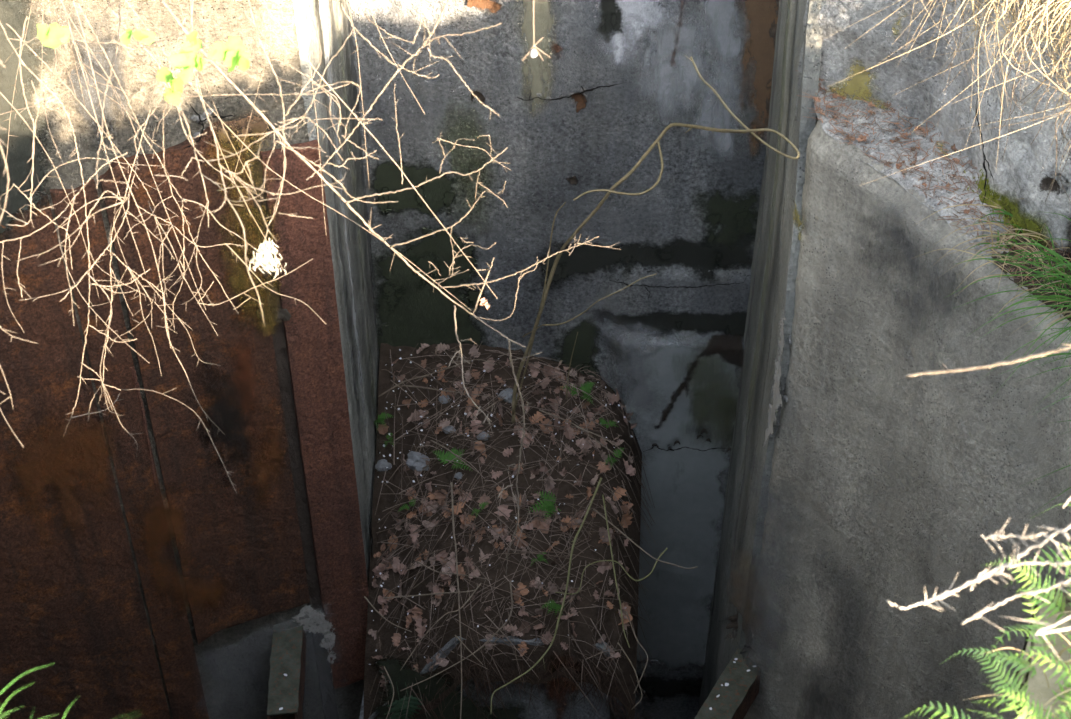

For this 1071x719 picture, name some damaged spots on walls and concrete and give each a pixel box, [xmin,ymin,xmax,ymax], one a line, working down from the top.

crack [517,82,625,101]
damp [442,114,489,217]
crack [975,91,994,207]
corrosion [213,112,277,333]
damp [466,289,483,309]
damp [539,213,753,290]
crack [609,11,797,615]